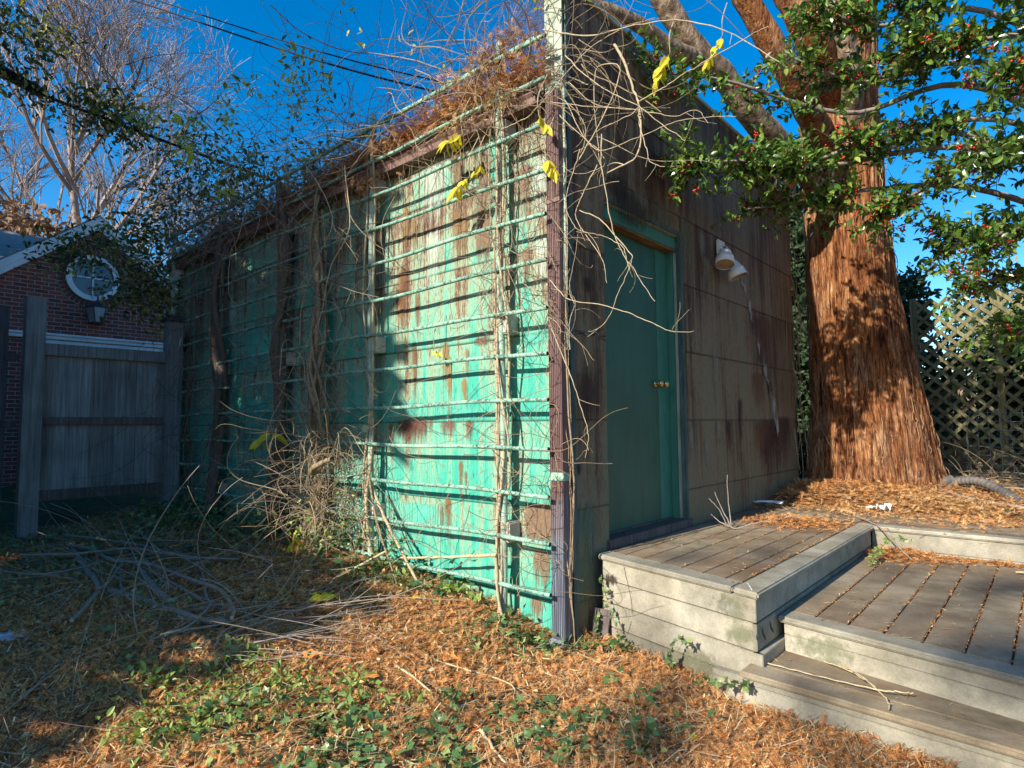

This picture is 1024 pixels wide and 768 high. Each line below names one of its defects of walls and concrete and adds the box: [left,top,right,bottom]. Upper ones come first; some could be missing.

corrosion [399,270,419,381]
corrosion [440,499,450,536]